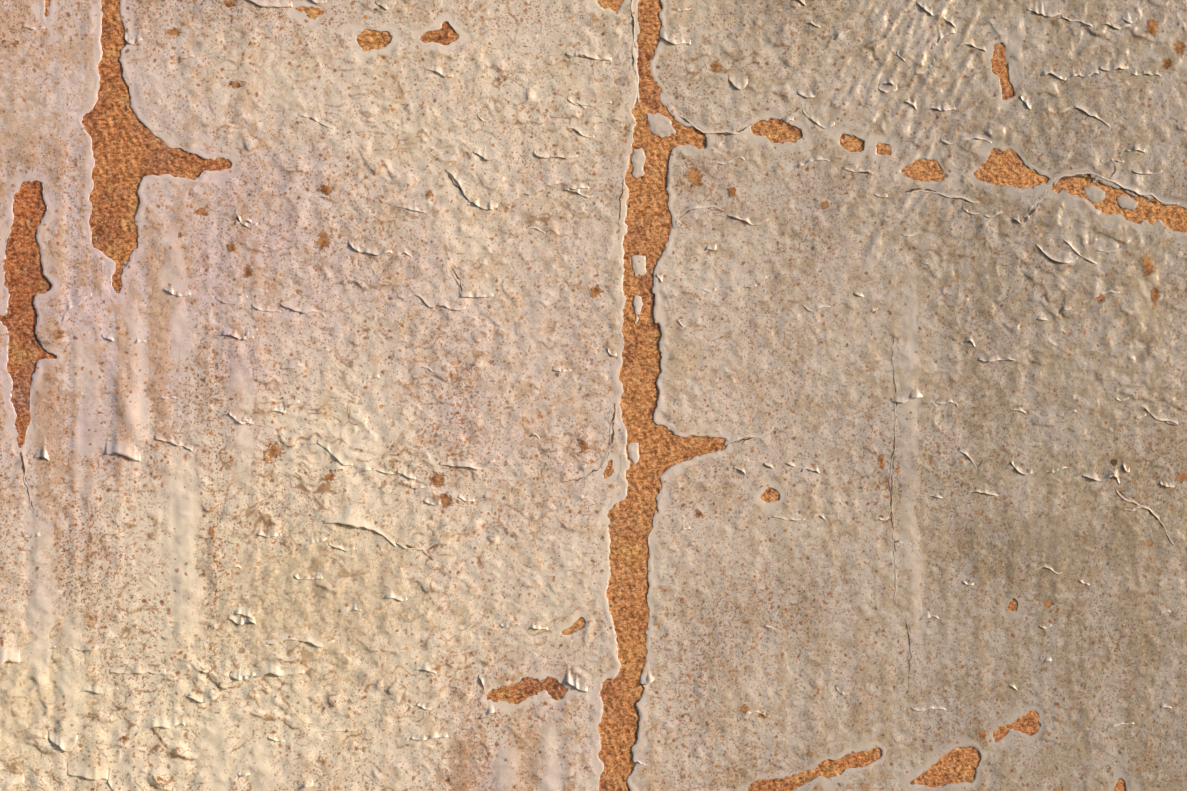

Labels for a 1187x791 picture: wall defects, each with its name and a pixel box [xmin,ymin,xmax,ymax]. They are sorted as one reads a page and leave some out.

peeling [355,26,399,58]
peeling [415,21,465,77]
peeling [896,0,1031,109]
peeling [747,85,1187,264]
peeling [0,0,235,461]
peeling [478,0,748,791]
peeling [747,739,887,791]
peeling [909,707,1041,790]